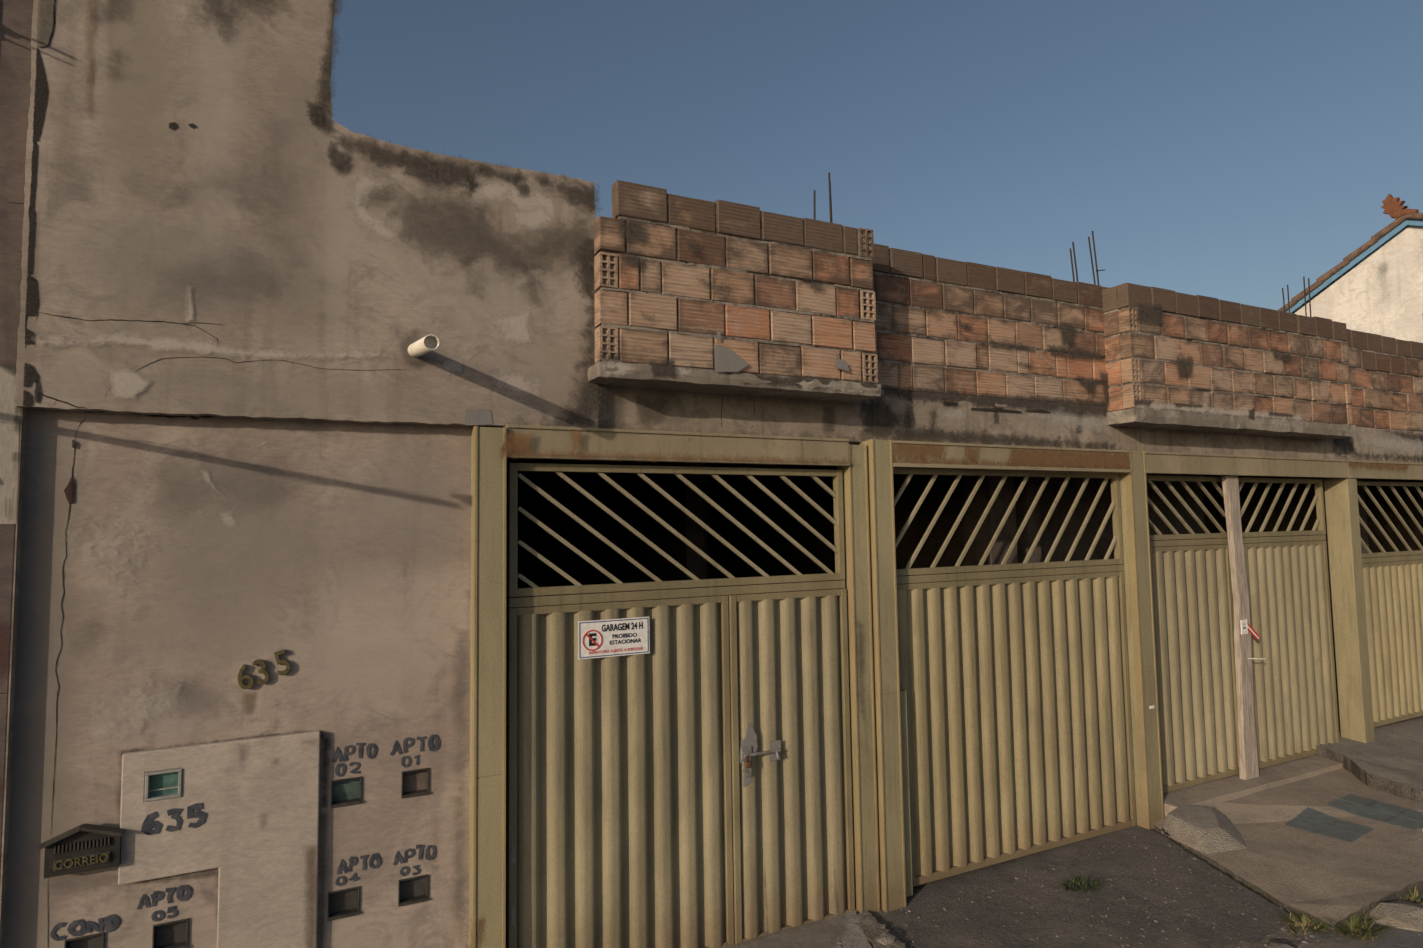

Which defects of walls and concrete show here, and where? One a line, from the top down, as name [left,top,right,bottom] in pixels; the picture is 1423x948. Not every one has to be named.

peeling [25,0,386,359]
damp [307,0,691,427]
peeling [0,363,40,524]
spalling [64,477,74,503]
peeling [111,370,148,399]
crack [10,176,401,828]
rust [894,443,1130,469]